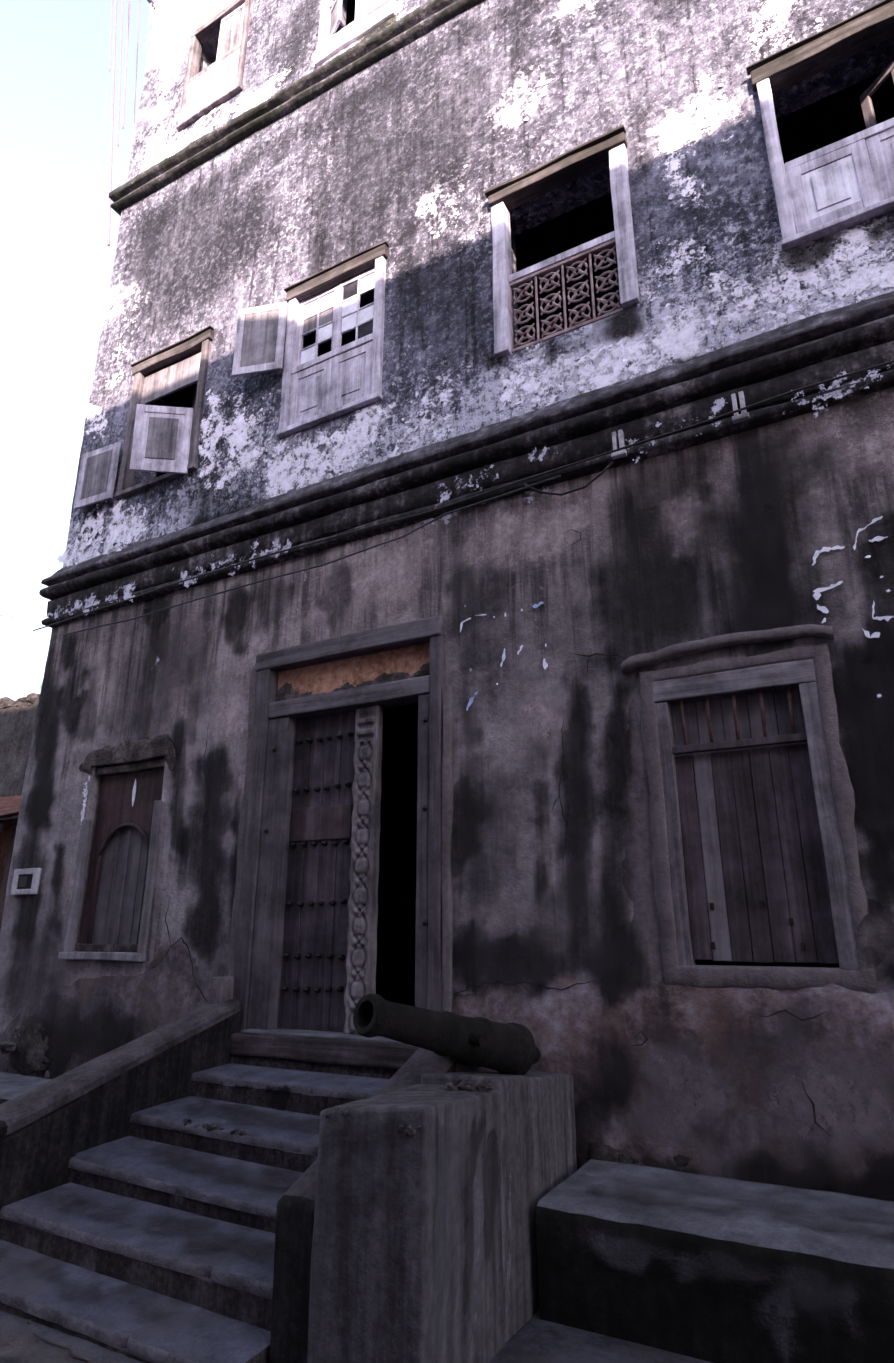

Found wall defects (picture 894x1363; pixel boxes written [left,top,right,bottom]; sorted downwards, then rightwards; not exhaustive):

peeling [645,75,751,207]
peeling [493,217,894,422]
peeling [198,365,474,502]
peeling [47,582,136,620]
peeling [55,499,162,568]
damp [110,595,239,969]
damp [451,434,824,1005]
damp [830,513,894,921]
damp [9,634,136,1079]
crack [149,898,206,1000]
damp [574,1038,637,1167]
crack [801,1082,832,1137]